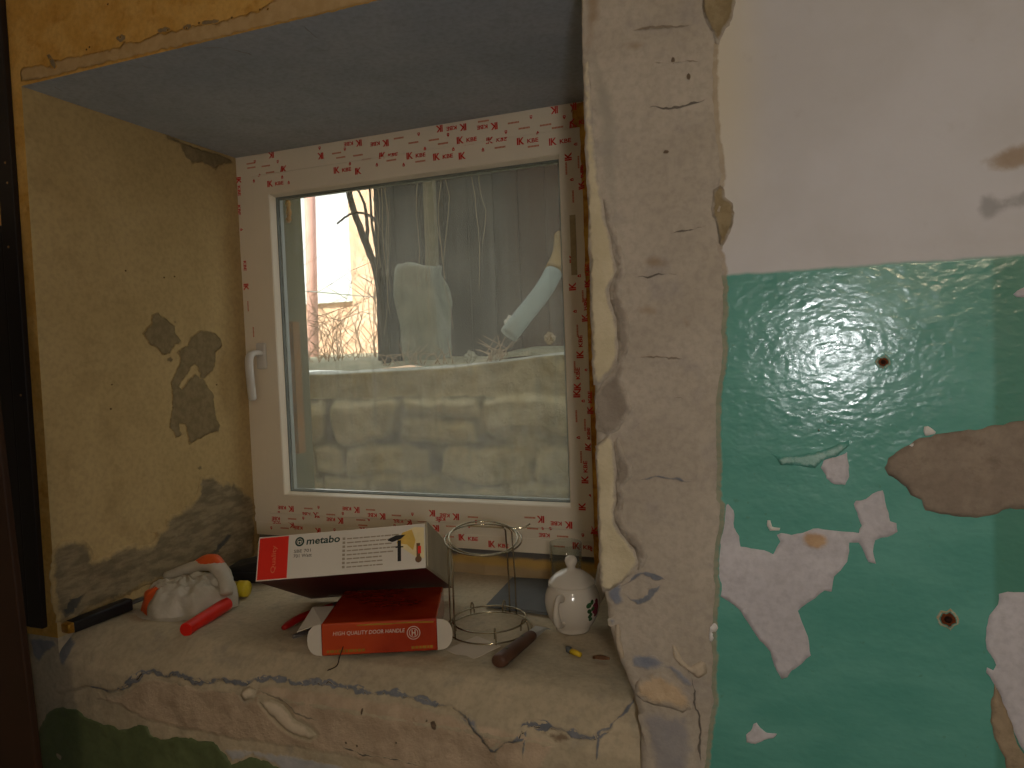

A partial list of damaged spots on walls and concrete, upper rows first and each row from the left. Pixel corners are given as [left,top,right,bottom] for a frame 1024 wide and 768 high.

crack [631,23,696,31]
spalling [702,0,736,45]
spalling [711,185,734,249]
spalling [142,312,222,445]
crack [634,39,730,768]
corrosion [874,354,891,370]
spalling [885,421,1024,518]
spalling [49,465,256,623]
peeling [719,490,898,679]
corrosion [935,608,960,631]
crack [90,668,635,766]
peeling [986,592,1024,768]